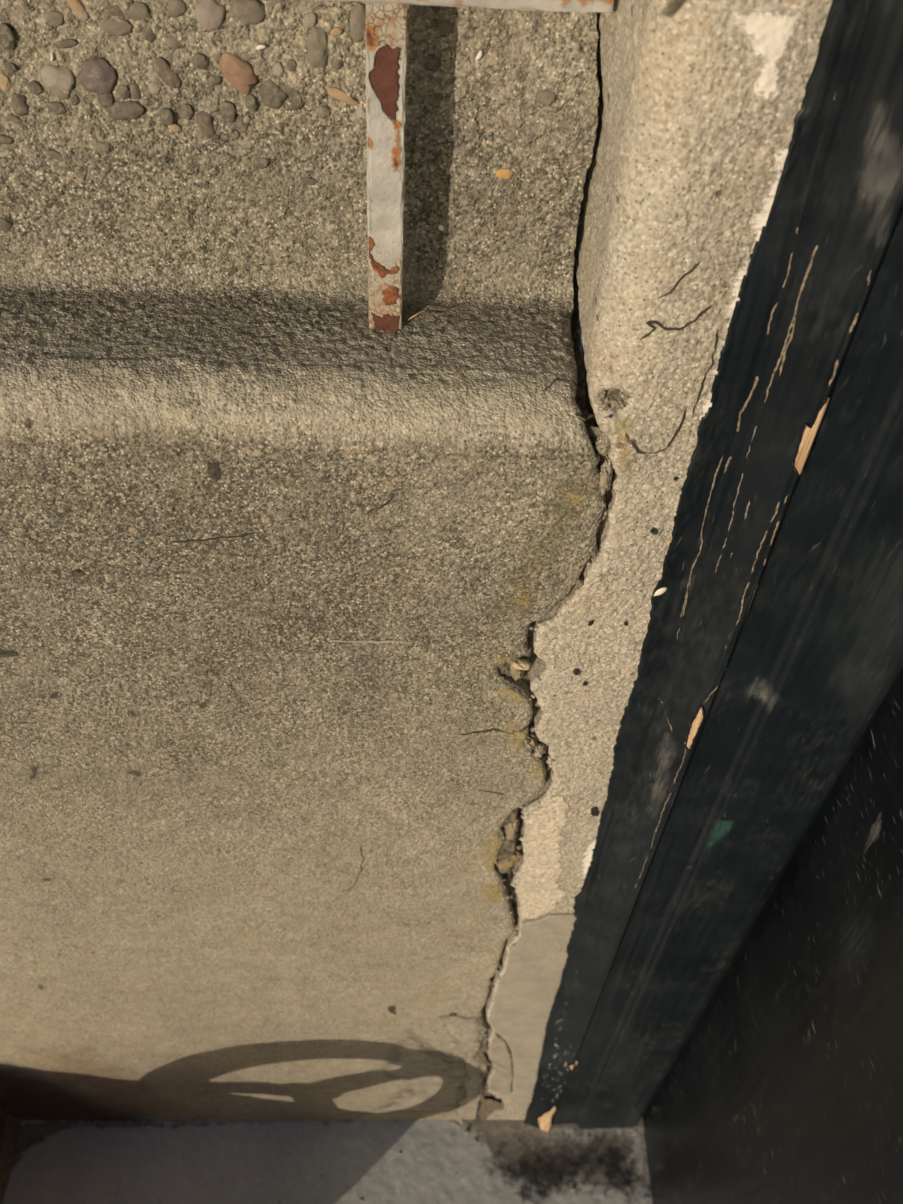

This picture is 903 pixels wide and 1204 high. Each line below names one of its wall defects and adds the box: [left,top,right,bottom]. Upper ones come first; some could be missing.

rust [366,24,402,170]
rust [368,236,401,332]
crack [458,621,556,1119]